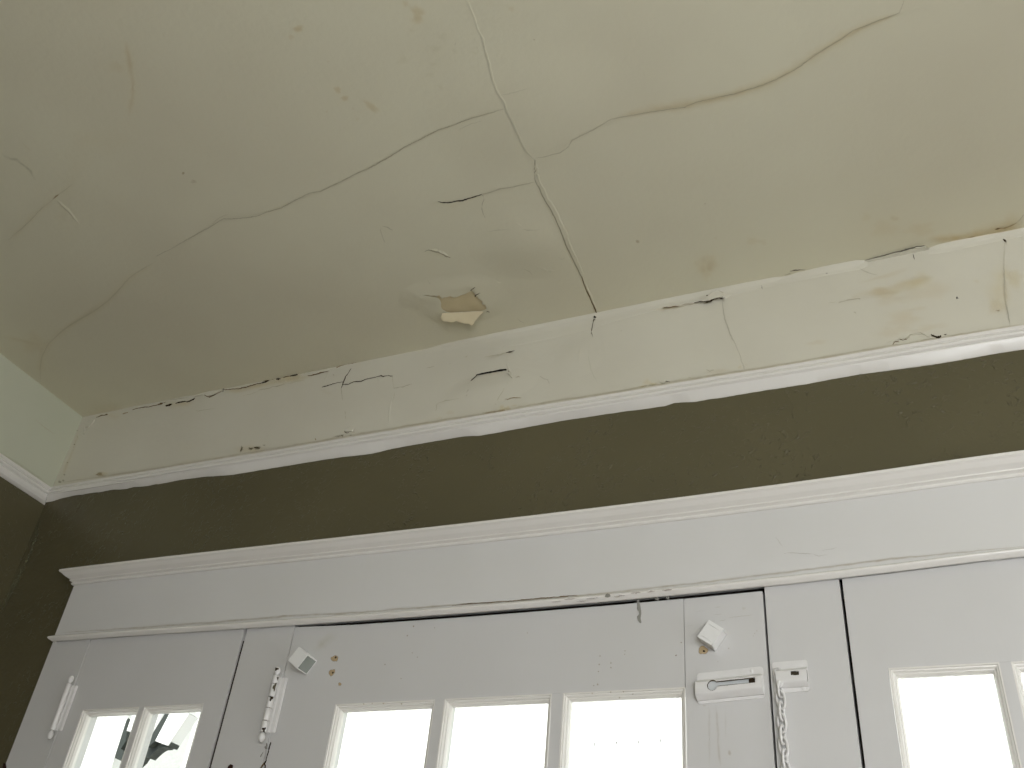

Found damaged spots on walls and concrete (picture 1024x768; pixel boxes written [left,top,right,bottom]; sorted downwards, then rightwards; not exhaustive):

crack [40,0,904,379]
crack [1002,239,1010,323]
crack [80,362,434,434]